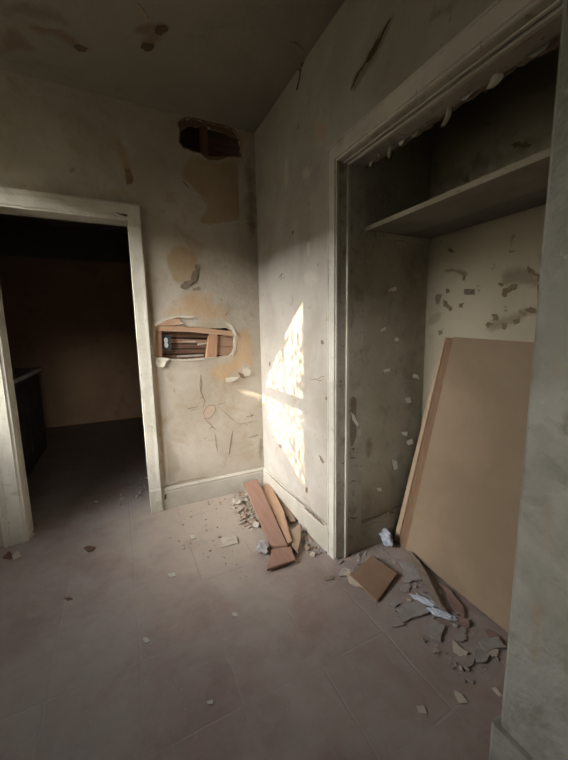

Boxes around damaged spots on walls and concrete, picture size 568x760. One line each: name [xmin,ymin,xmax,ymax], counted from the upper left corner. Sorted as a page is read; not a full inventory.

peeling [366,33,561,168]
spalling [178,117,243,160]
peeling [163,242,201,291]
spalling [152,316,256,384]
crack [189,375,257,453]